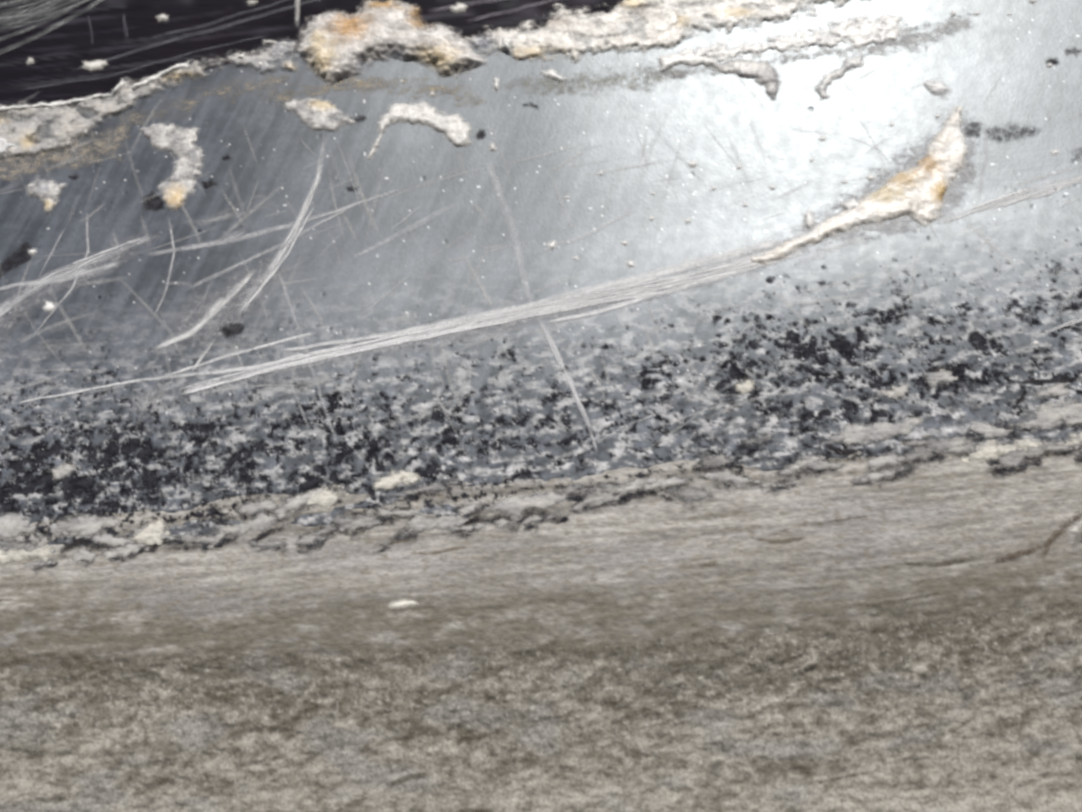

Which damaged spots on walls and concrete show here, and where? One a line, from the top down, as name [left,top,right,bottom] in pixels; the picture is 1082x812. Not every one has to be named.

peeling [0,60,210,160]
peeling [229,40,296,72]
peeling [285,98,365,130]
peeling [369,92,495,158]
peeling [465,0,907,99]
peeling [924,81,950,95]
water stain [234,173,319,303]
water stain [0,239,138,316]
water stain [176,241,793,393]
water stain [23,379,150,402]
water stain [1067,520,1082,544]